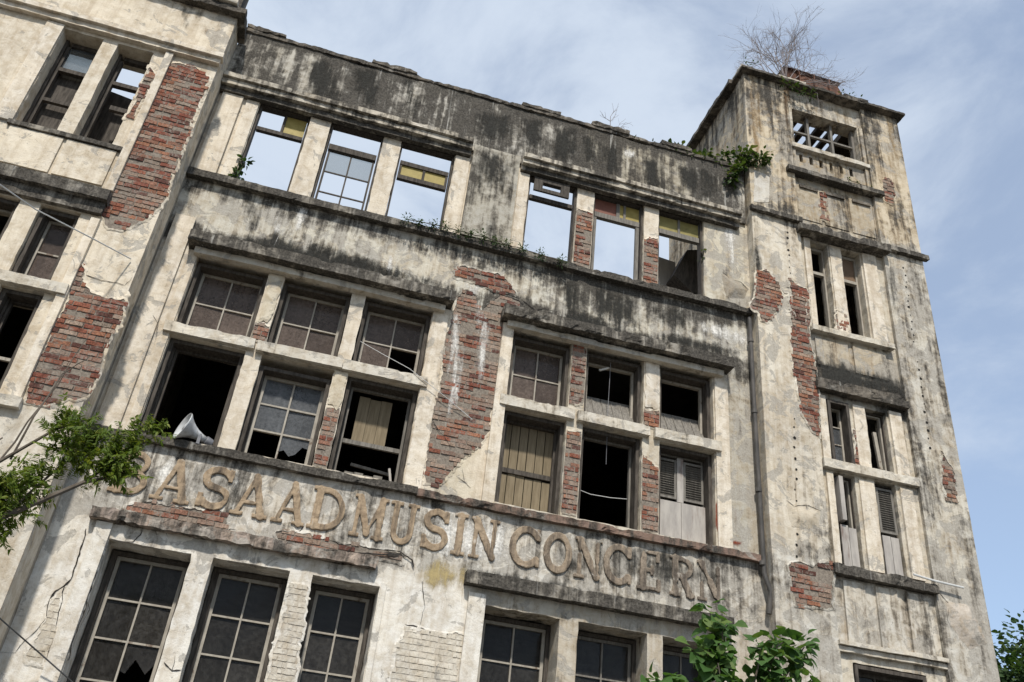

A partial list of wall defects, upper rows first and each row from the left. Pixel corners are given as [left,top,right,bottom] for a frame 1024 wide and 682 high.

water stain [309,61,339,100]
spalling [98,61,212,233]
water stain [606,146,660,188]
water stain [678,166,717,196]
water stain [236,199,441,284]
spalling [23,262,131,409]
spalling [422,264,524,488]
water stain [562,283,749,354]
spalling [748,269,822,439]
crack [5,529,167,660]
flaking render [264,580,311,682]
spalling [786,560,836,612]